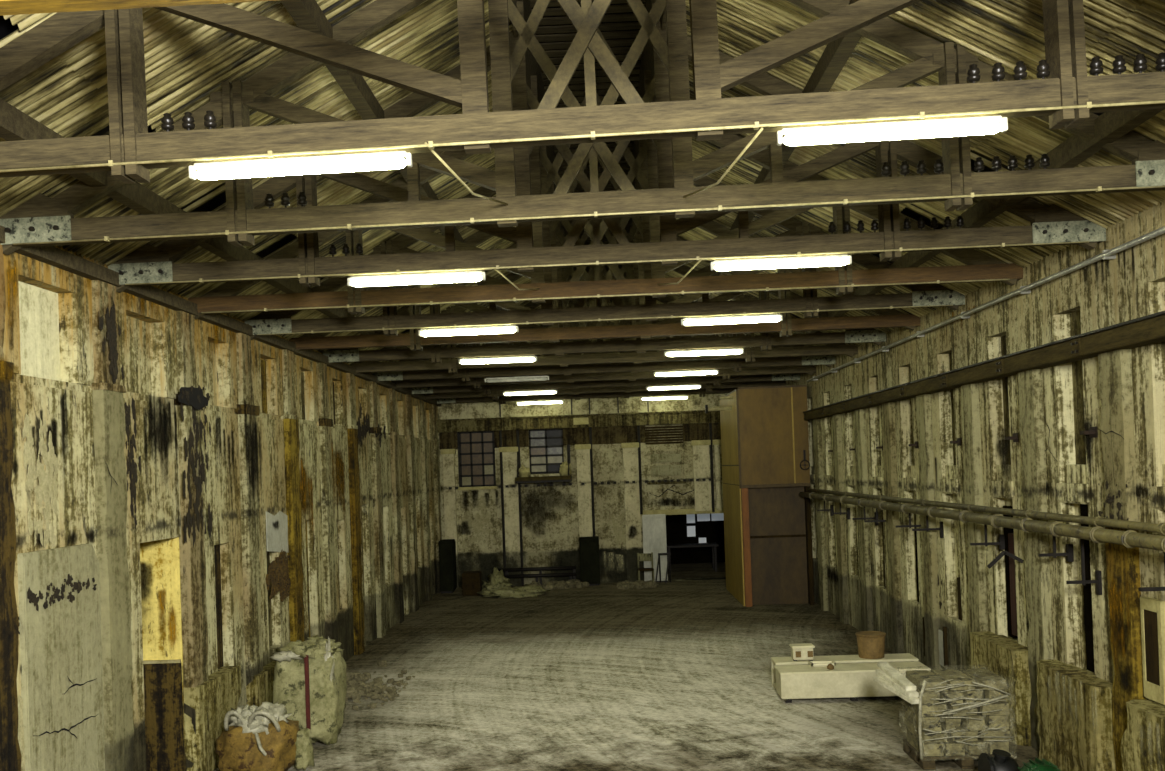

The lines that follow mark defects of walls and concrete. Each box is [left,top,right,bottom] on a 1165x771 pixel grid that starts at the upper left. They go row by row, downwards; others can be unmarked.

damp [144,394,178,475]
spalling [27,574,97,611]
crack [33,714,98,739]